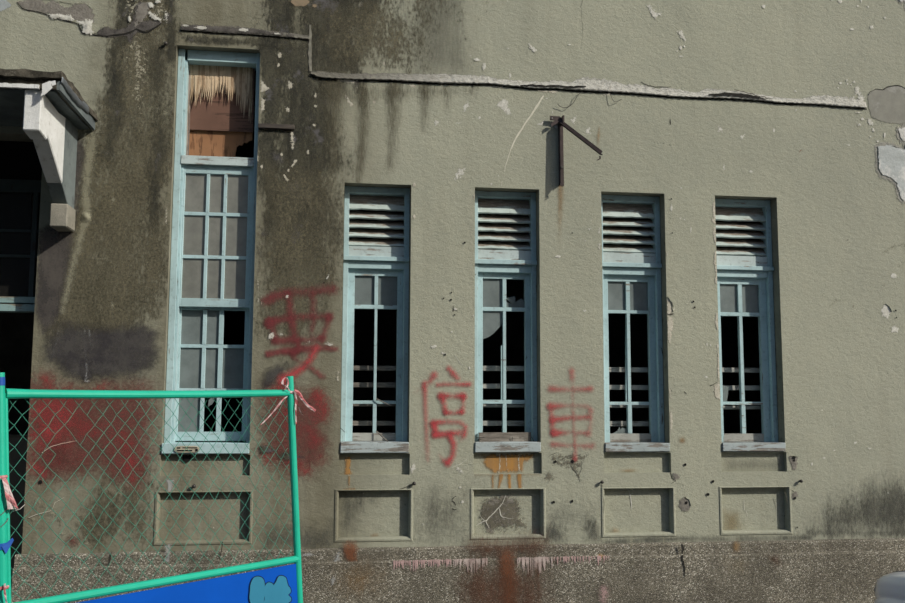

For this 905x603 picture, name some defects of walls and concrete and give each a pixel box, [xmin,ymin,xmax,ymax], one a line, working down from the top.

flaking render [0,0,168,43]
crack [181,24,905,186]
water stain [36,0,447,365]
peeling [856,112,905,203]
crack [476,495,513,527]
crack [679,544,687,577]